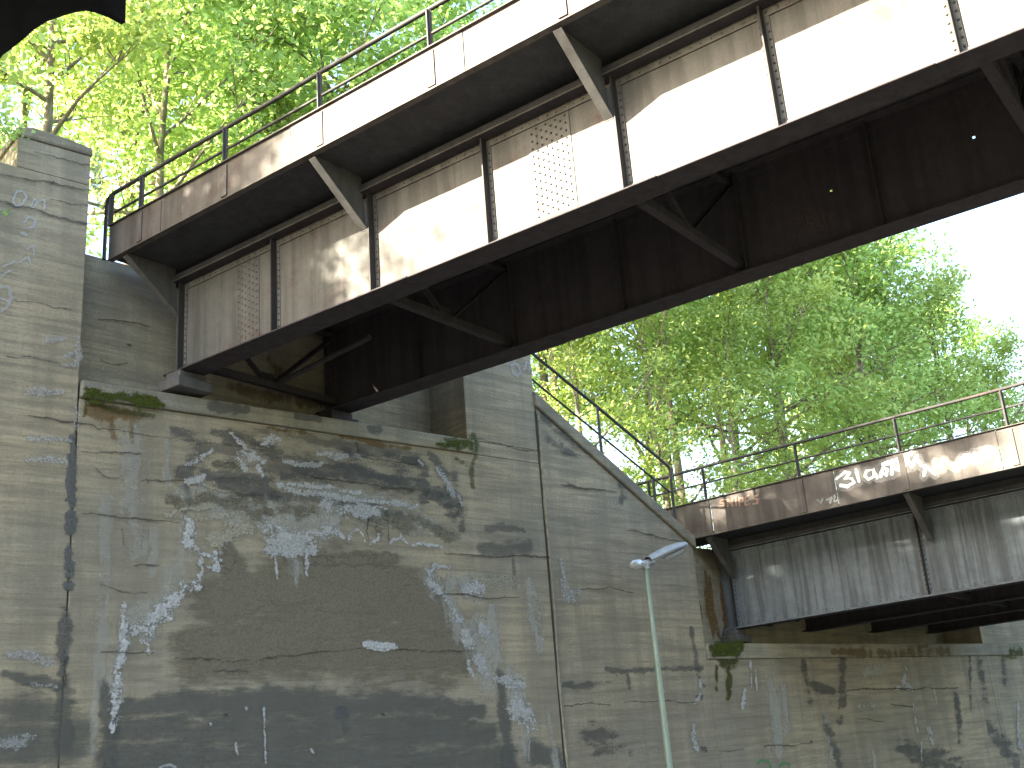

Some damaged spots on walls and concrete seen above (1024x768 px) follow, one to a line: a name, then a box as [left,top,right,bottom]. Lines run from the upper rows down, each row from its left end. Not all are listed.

rust [86,403,137,439]
damp [0,405,566,768]
rust [699,571,727,638]
crack [100,648,362,672]
damp [581,721,622,755]
damp [563,626,703,704]
damp [741,660,789,760]
damp [802,657,874,768]
damp [896,665,962,768]
damp [954,656,988,743]
damp [986,705,1022,768]